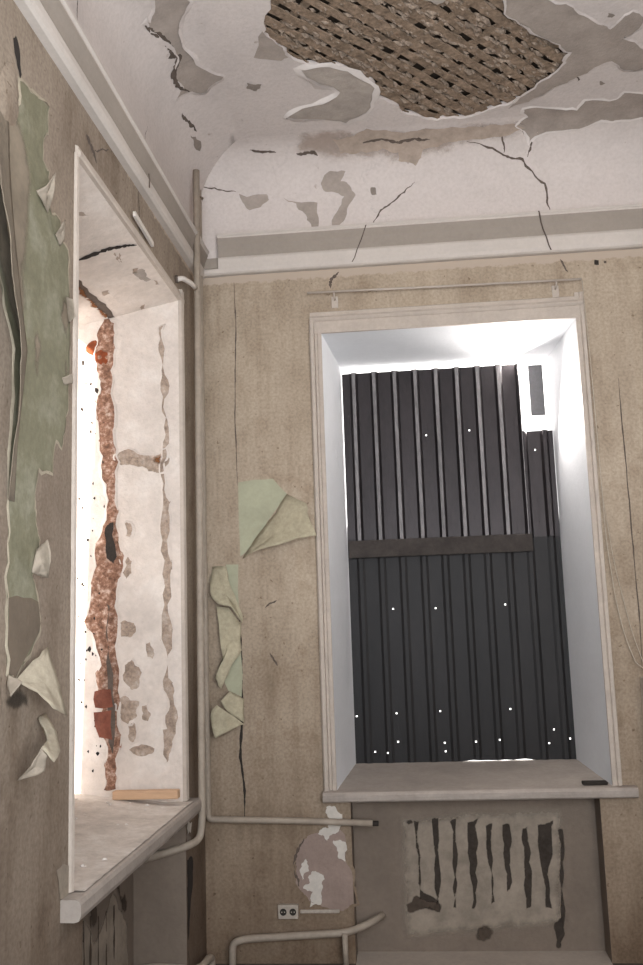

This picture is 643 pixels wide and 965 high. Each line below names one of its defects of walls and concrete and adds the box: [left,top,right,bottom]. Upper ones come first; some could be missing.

peeling [141,0,226,107]
peeling [182,114,201,151]
flaking render [254,0,643,166]
crack [79,174,150,261]
crack [329,185,412,288]
crack [467,131,568,272]
spalling [77,318,180,794]
flaking render [8,596,41,677]
peeling [293,806,360,915]